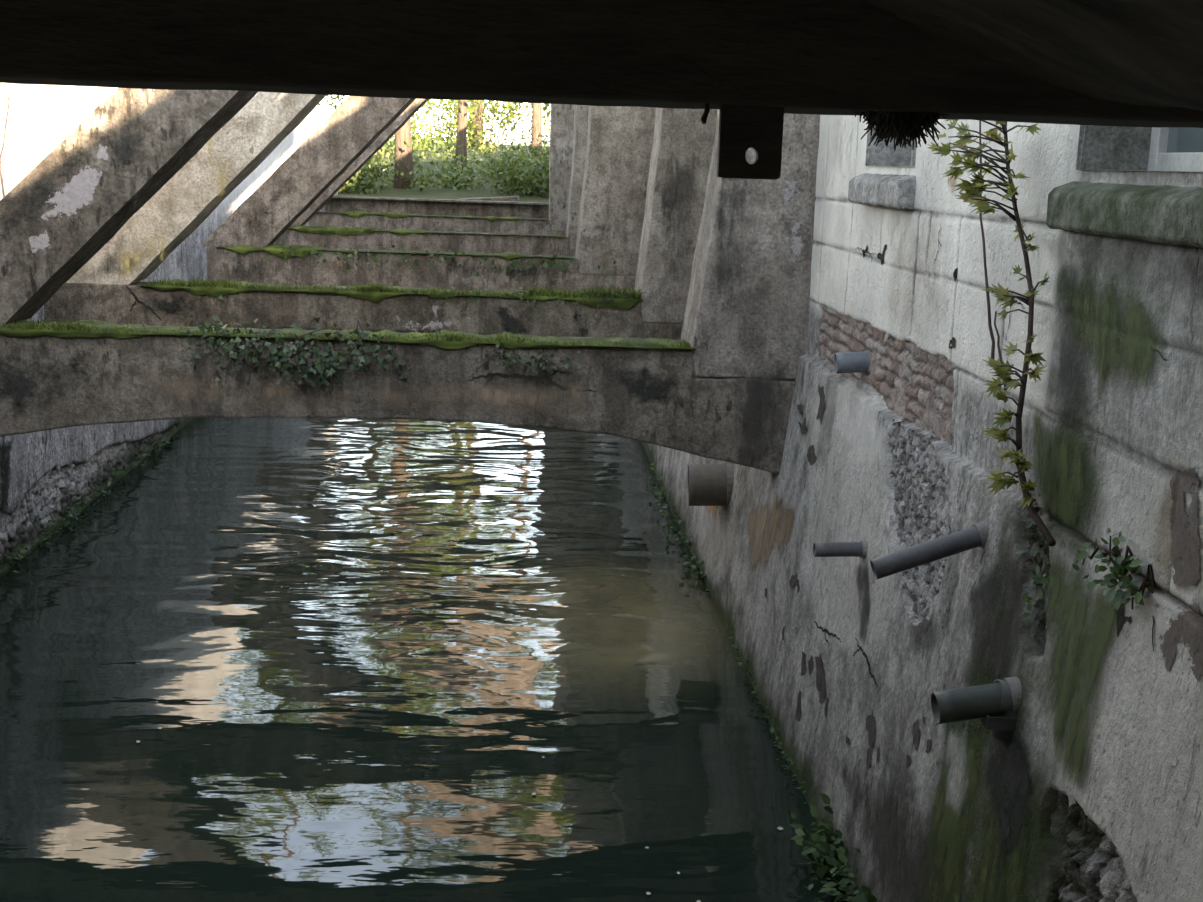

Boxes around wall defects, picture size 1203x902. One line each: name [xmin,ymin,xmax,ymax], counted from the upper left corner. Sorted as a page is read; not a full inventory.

peeling [797,385,826,466]
flaking render [818,306,956,550]
flaking render [0,425,176,565]
flaking render [900,557,948,621]
crack [815,621,878,686]
flaking render [1050,792,1137,902]